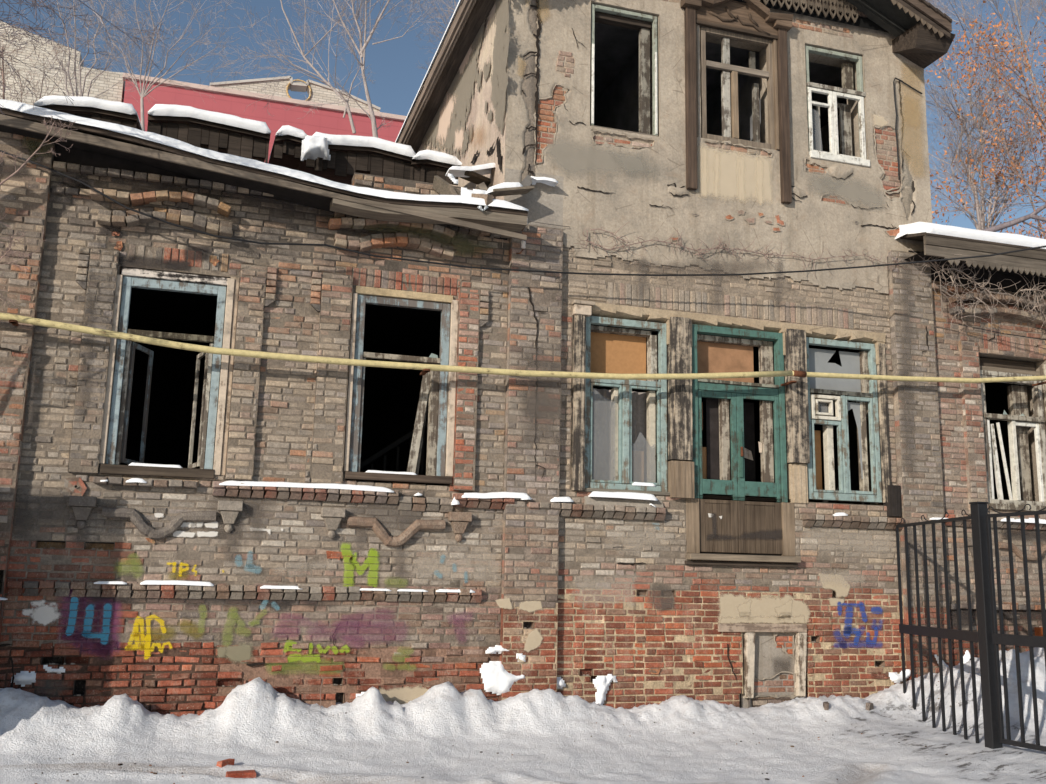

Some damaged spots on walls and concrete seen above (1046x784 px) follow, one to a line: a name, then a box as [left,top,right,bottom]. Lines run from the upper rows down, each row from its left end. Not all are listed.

peeling [422,0,511,160]
crack [471,137,501,172]
spalling [528,0,538,38]
crack [527,0,542,175]
spalling [521,51,575,186]
spalling [873,115,915,237]
crack [527,287,545,488]